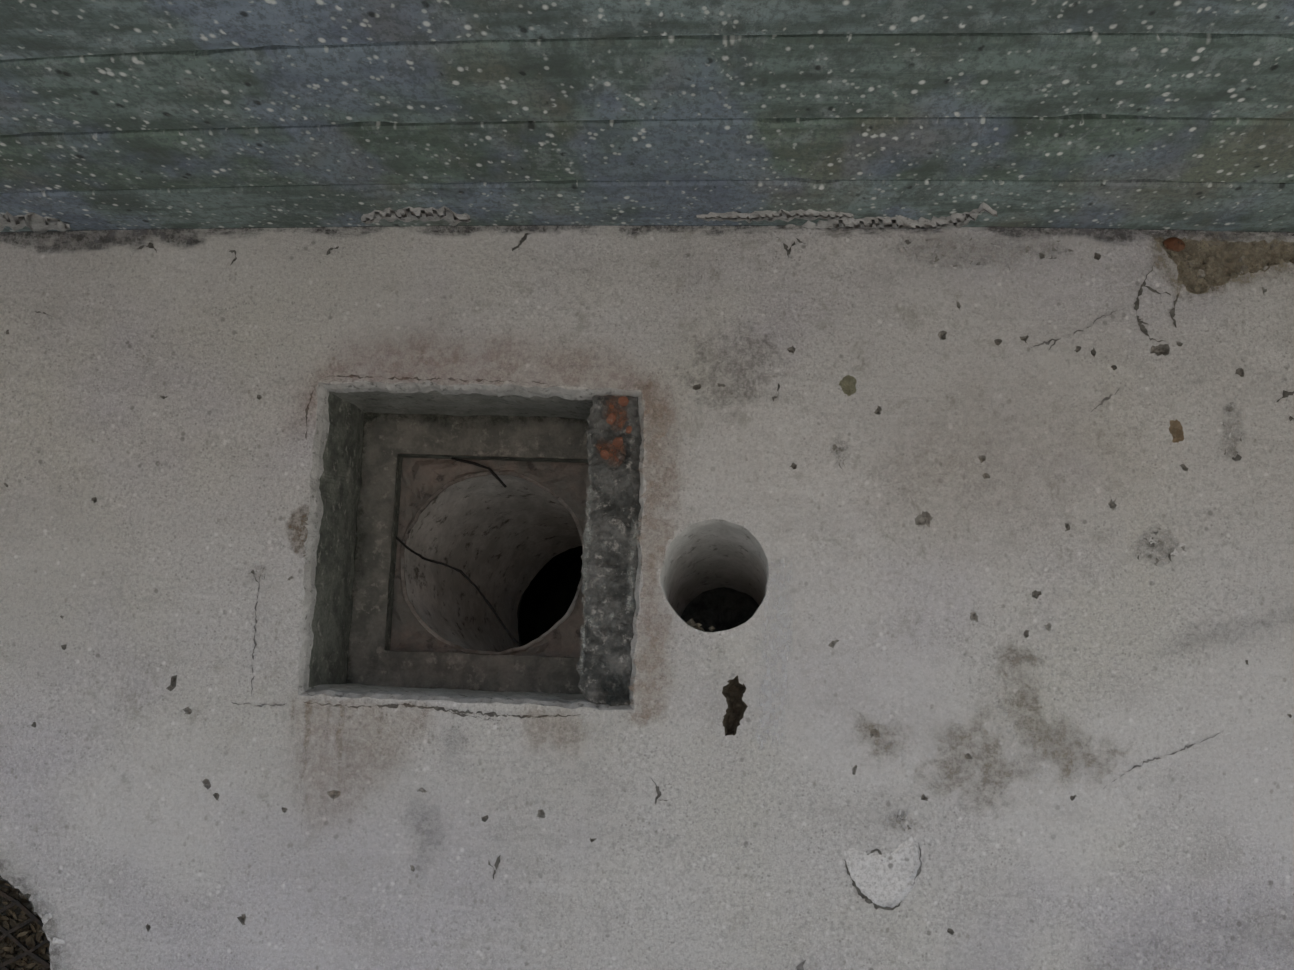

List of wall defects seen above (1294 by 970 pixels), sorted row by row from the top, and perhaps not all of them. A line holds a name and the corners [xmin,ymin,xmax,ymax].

spalling [1154,234,1294,294]
crack [1020,262,1179,351]
spalling [722,675,748,736]
peeling [843,836,922,910]
spalling [0,875,65,970]